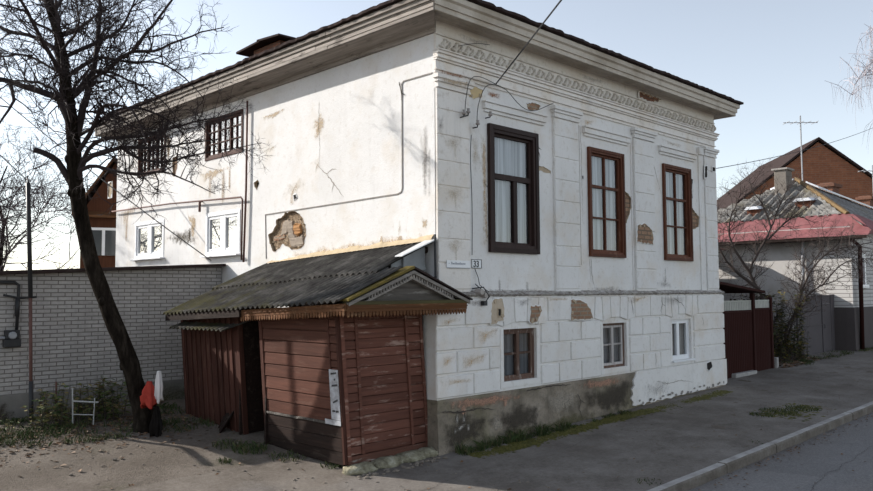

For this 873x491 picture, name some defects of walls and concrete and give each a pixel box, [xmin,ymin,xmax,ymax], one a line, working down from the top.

spalling [691,177,699,230]
spalling [268,193,307,252]
spalling [625,191,654,245]
spalling [490,297,505,325]
spalling [529,304,543,324]
spalling [570,298,593,321]
damp [588,383,633,410]
damp [447,416,492,446]
damp [503,405,538,431]